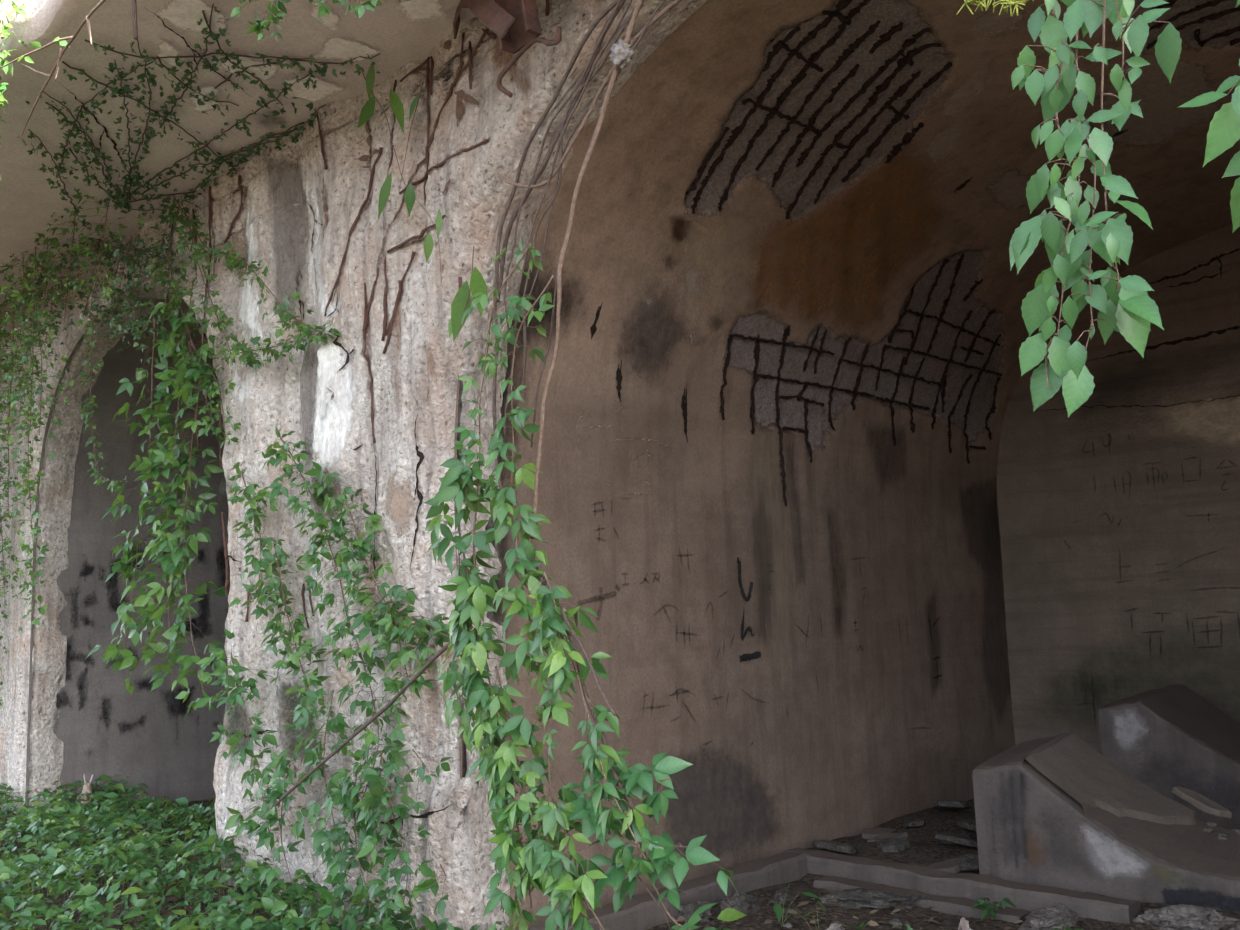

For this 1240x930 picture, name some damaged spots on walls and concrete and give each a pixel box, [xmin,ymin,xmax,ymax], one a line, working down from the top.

corrosion [354,121,379,170]
corrosion [454,90,479,127]
spalling [684,0,952,221]
spalling [719,250,1005,506]
crack [410,414,424,570]